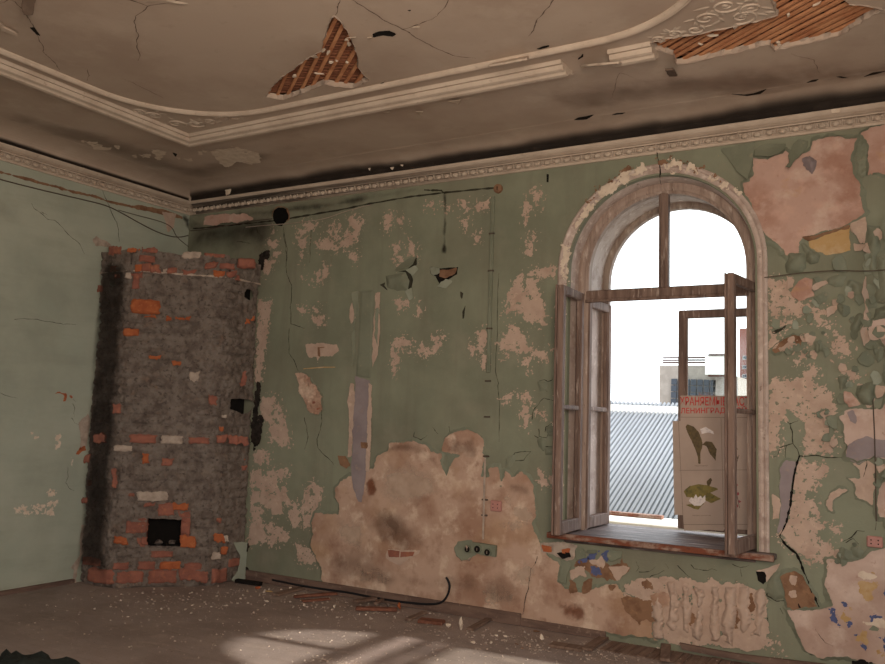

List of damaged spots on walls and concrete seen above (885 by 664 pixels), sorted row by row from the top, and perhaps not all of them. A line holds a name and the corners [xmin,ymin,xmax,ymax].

crack [130,0,178,60]
flaking render [266,15,369,100]
crack [336,0,470,58]
flaking render [651,0,883,65]
peeling [572,162,647,233]
peeling [262,223,282,280]
peeling [292,210,370,288]
peeling [467,185,573,377]
flaking render [655,124,885,664]
flaking render [71,414,90,466]
flaking render [245,288,660,645]
crack [775,422,842,607]